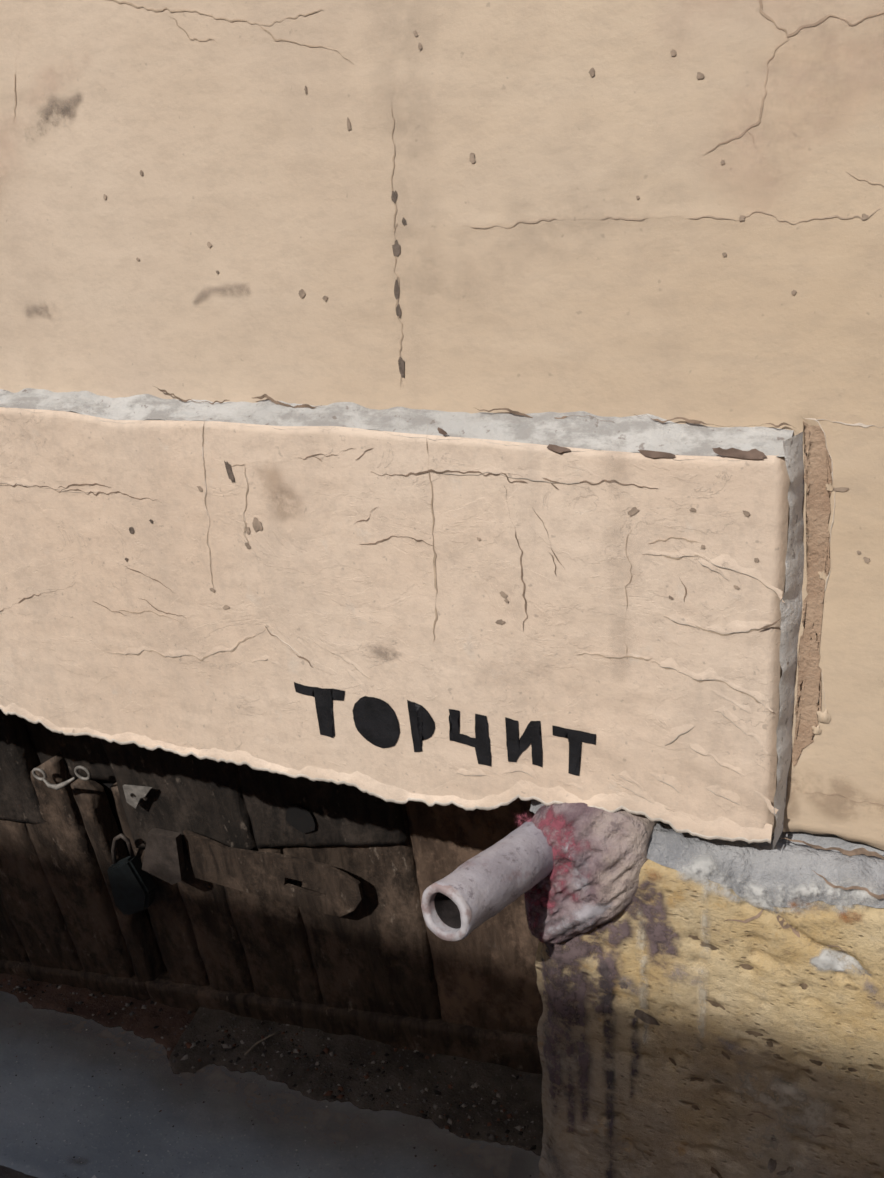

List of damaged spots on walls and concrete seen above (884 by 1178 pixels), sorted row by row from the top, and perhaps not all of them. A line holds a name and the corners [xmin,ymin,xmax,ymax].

crack [113,0,352,63]
crack [703,0,884,166]
peeling [547,444,570,453]
peeling [638,450,675,458]
peeling [712,447,767,459]
crack [0,477,162,503]
crack [233,425,658,641]
crack [93,568,185,621]
spalling [792,418,836,767]
damp [680,856,879,921]
spalling [688,935,719,950]
damp [517,809,706,1178]